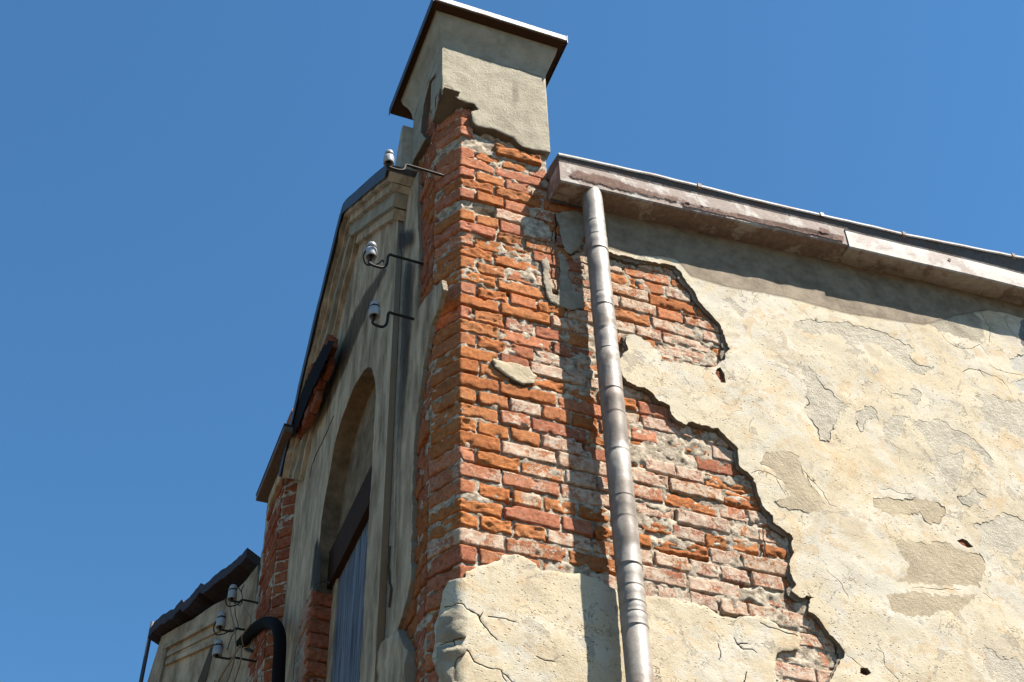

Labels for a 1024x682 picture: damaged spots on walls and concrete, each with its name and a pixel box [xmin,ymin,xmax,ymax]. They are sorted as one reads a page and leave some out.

spalling [609,259,724,383]
spalling [286,334,338,440]
spalling [401,100,617,682]
spalling [246,478,298,682]
crack [447,603,514,640]
crack [454,642,512,682]
spalling [623,386,837,682]
peeling [873,497,946,525]
peeling [887,512,1024,617]